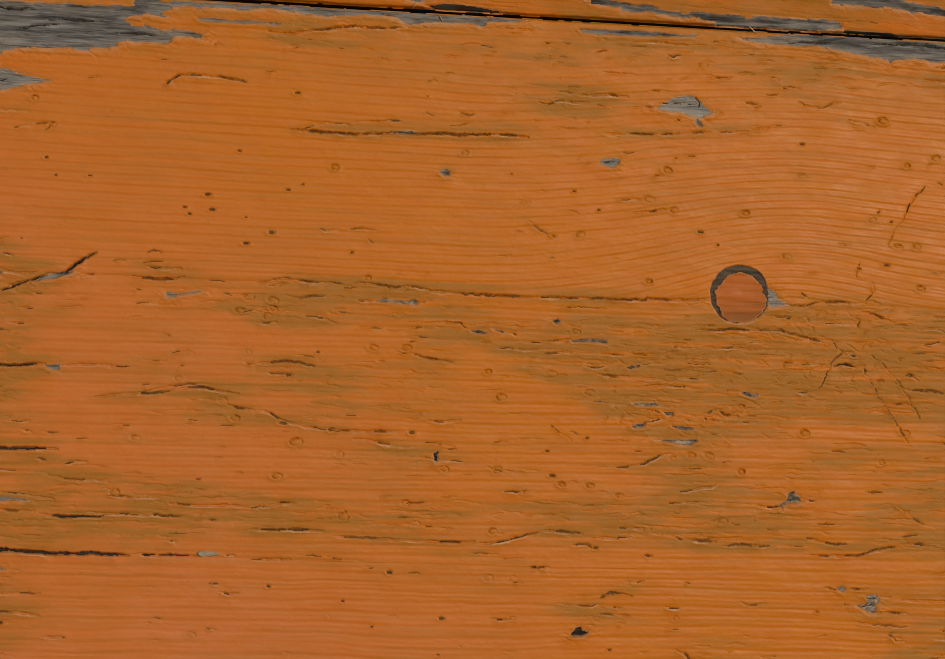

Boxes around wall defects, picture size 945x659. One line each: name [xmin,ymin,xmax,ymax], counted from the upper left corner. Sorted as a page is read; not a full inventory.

peeling [0,0,522,53]
peeling [580,0,945,63]
peeling [0,68,49,90]
crack [302,112,513,137]
peeling [657,96,712,127]
crack [0,250,174,330]
crack [461,293,668,309]
crack [0,348,36,387]
crack [116,335,214,394]
crack [591,293,945,405]
crack [0,420,87,521]
crack [0,495,189,556]